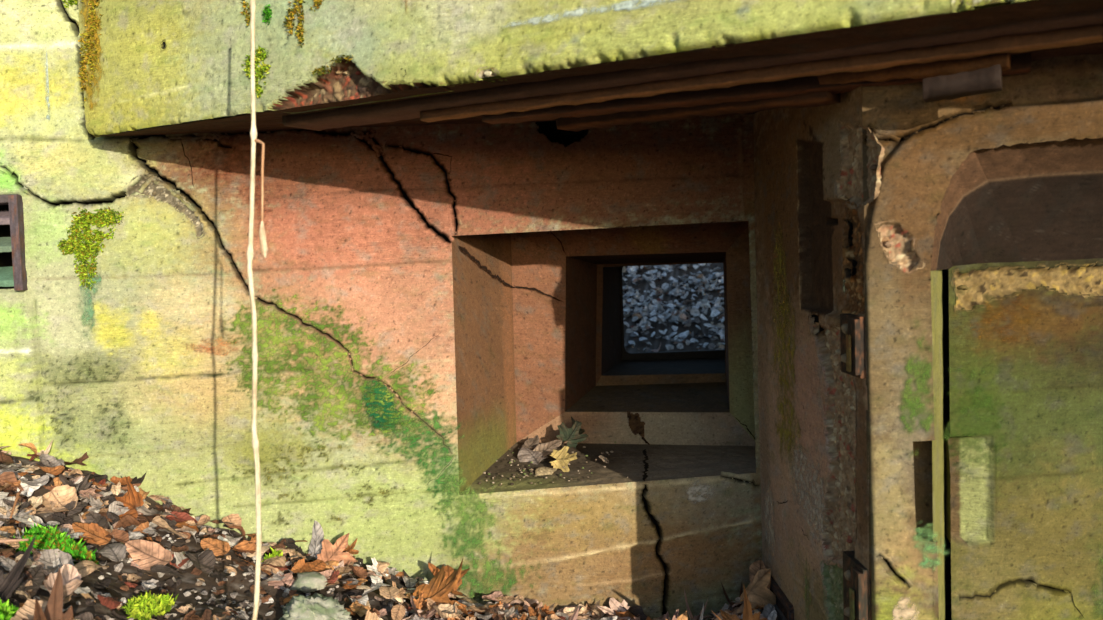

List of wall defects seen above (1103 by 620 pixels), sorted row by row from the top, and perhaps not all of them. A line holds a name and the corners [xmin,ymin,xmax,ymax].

crack [53,0,98,140]
spalling [268,55,446,110]
spalling [874,219,926,275]
crack [0,127,563,483]
spalling [950,261,1103,313]
spalling [808,119,885,620]
leakage [233,445,364,500]
crack [639,437,672,619]
crack [876,551,914,591]
crack [959,576,1083,616]